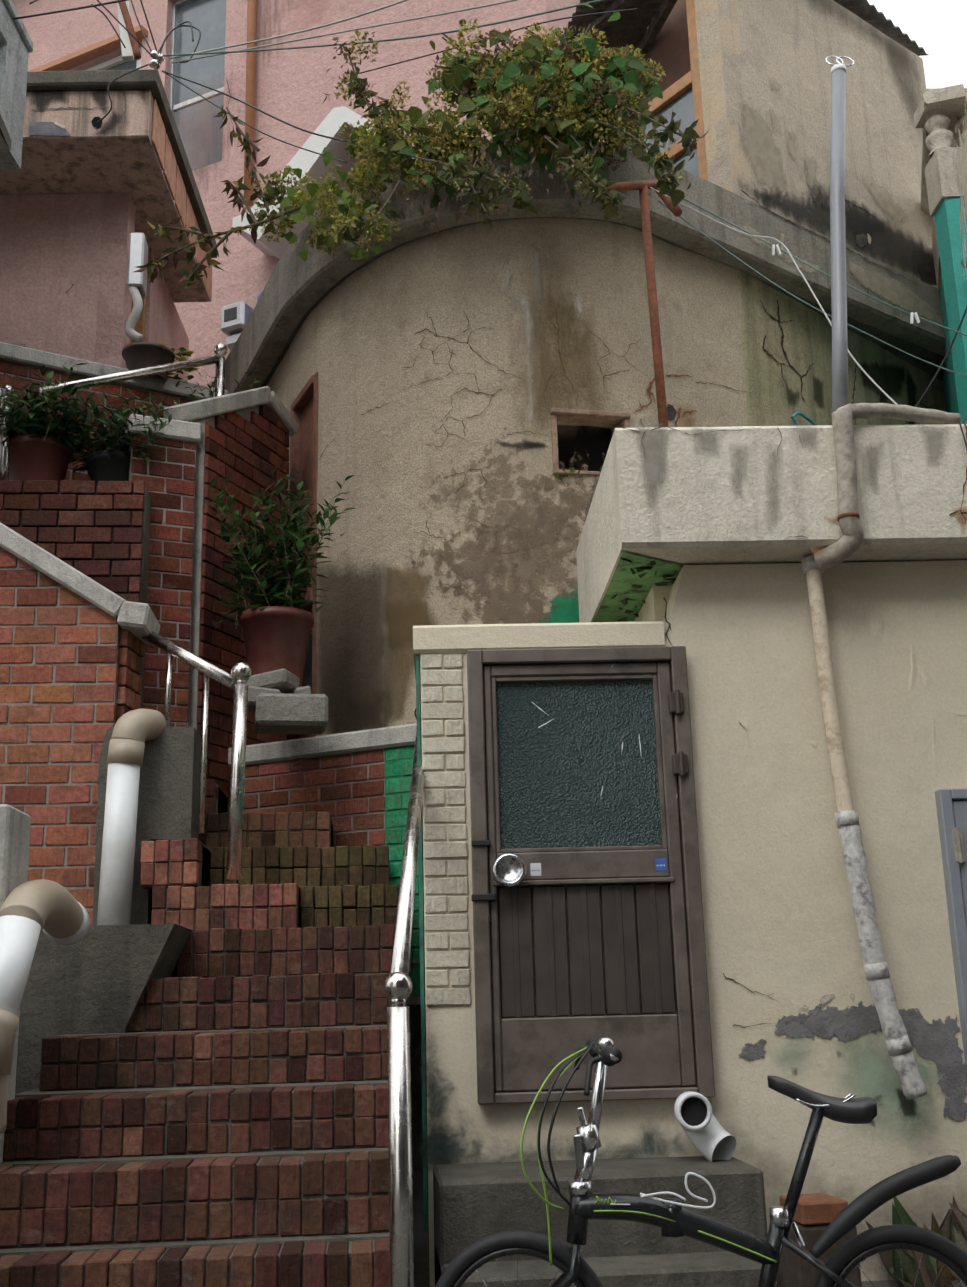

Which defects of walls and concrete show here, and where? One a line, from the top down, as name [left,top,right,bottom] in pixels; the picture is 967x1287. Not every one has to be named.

damp [730,103,943,325]
crack [361,299,814,593]
peeling [739,994,883,1063]
peeling [898,1008,967,1121]